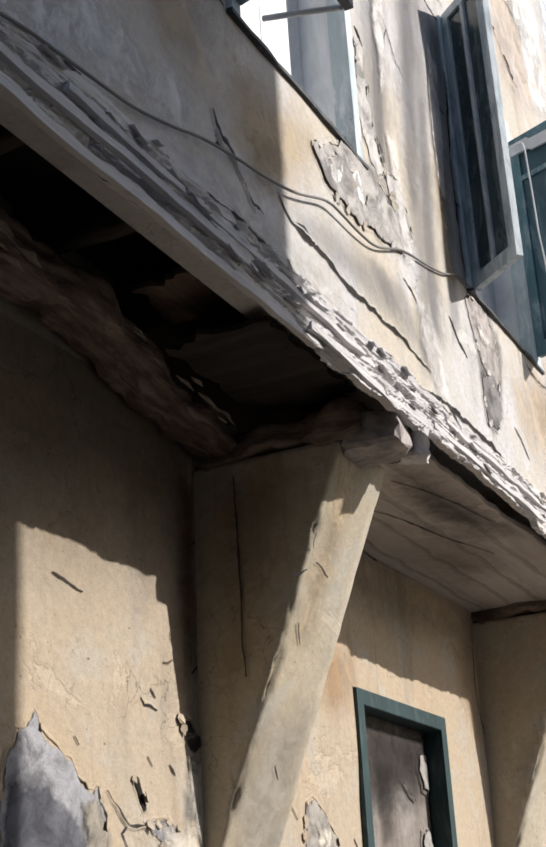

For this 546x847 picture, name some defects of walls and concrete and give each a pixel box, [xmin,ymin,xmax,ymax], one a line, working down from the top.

peeling [373,0,384,83]
crack [207,108,267,248]
flaking render [308,36,414,263]
peeling [427,45,445,195]
crack [427,73,467,277]
crack [278,191,530,482]
flaking render [462,292,503,435]
crack [233,476,247,677]
flaking render [0,705,112,847]
crack [106,790,181,847]
flaking render [176,712,201,758]
damp [366,719,427,808]